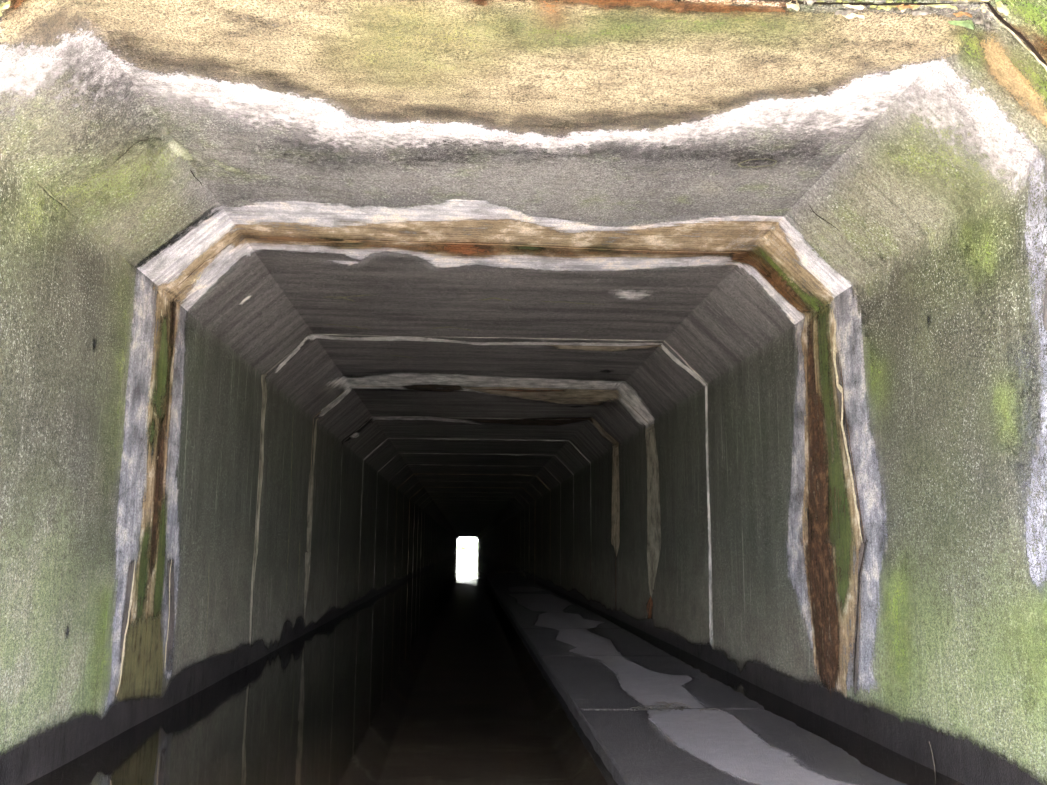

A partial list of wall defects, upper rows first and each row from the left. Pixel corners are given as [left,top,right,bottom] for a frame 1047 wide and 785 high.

corrosion [5,0,28,14]
corrosion [518,0,789,19]
corrosion [149,301,176,576]
damp [0,0,1047,591]
damp [0,199,1047,785]
corrosion [248,235,840,691]